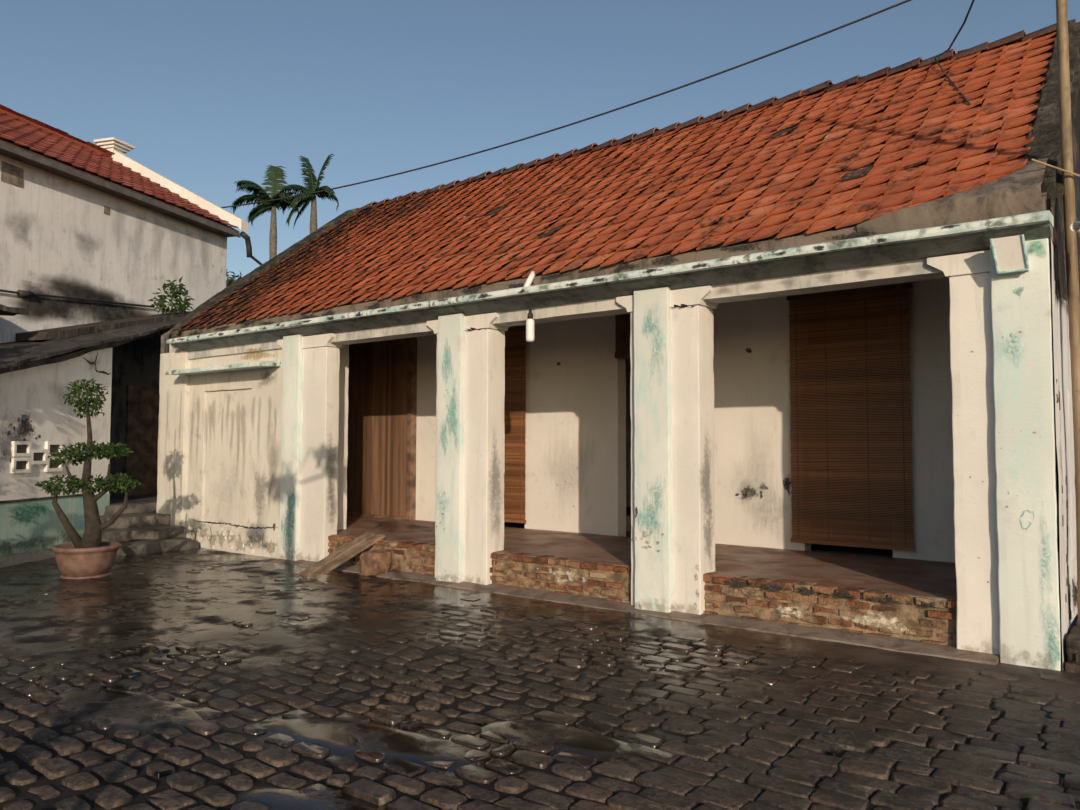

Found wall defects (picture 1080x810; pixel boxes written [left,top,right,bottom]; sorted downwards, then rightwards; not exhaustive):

water stain [1054,244,1068,312]
mould [0,415,41,462]
peeling [442,389,456,449]
crack [191,519,277,543]
peeling [634,507,664,552]